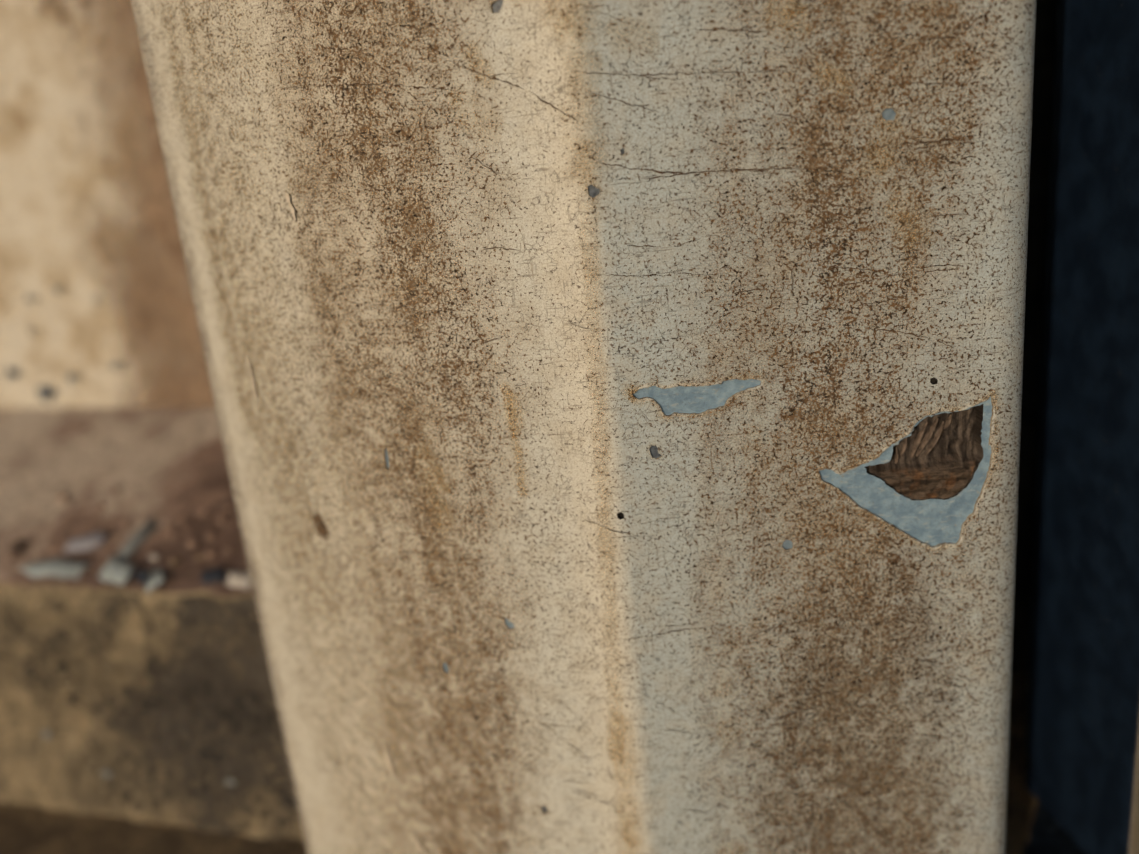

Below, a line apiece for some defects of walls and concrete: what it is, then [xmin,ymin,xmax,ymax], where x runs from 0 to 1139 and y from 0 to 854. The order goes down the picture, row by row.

peeling [629,375,765,420]
damp [670,0,1026,854]
peeling [815,390,998,551]